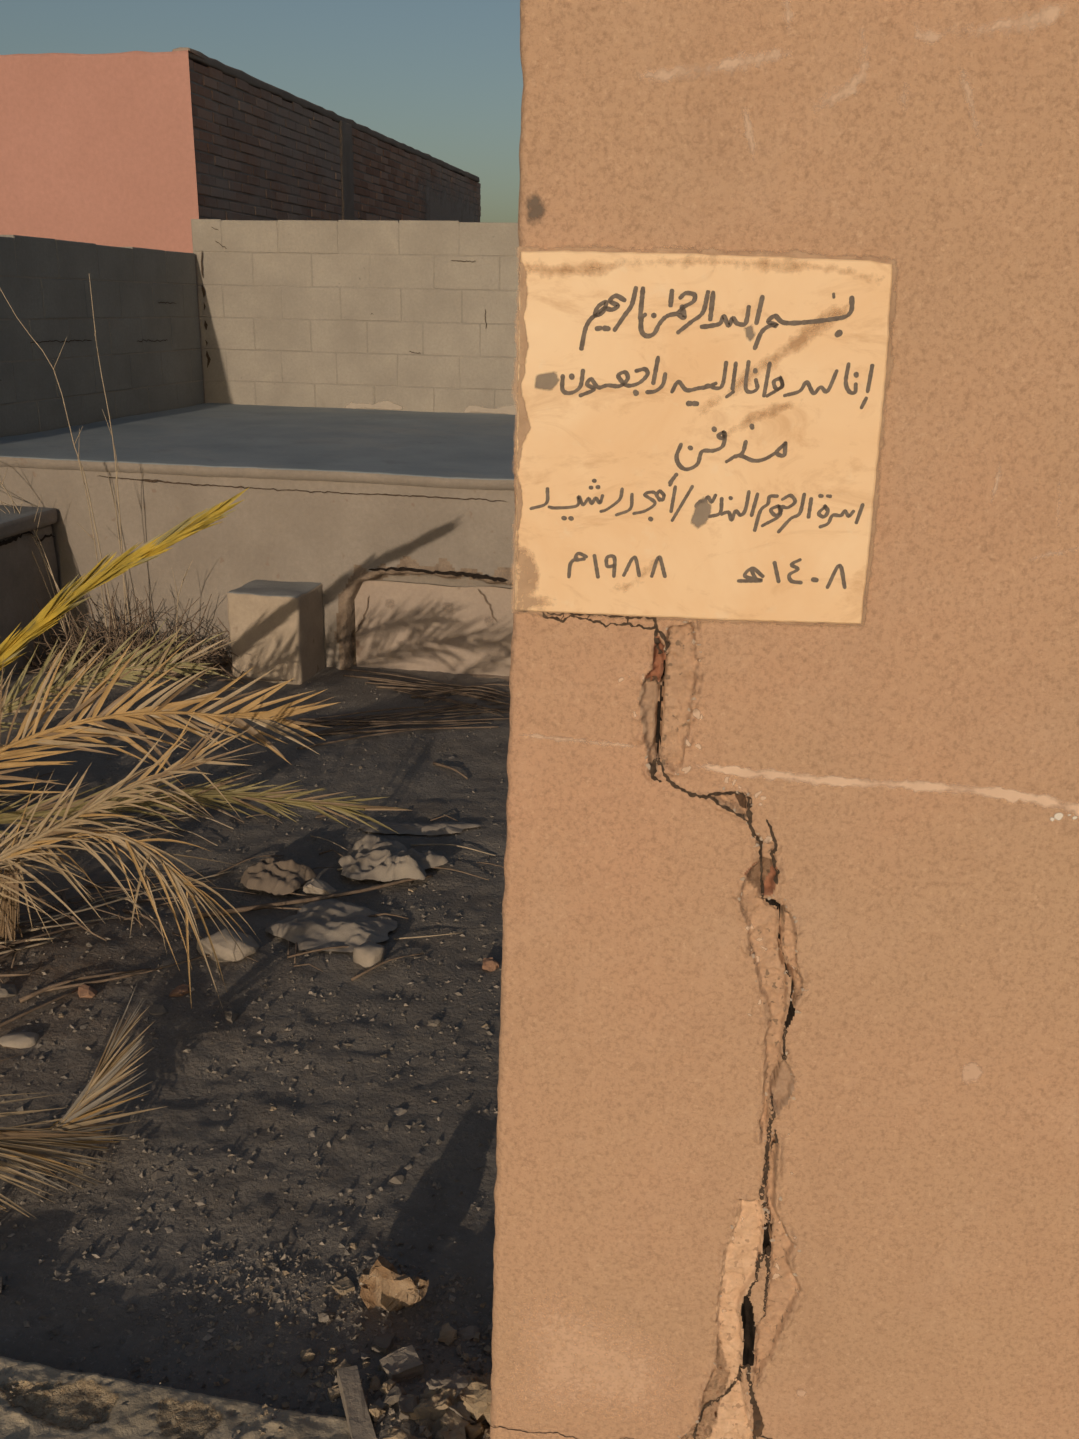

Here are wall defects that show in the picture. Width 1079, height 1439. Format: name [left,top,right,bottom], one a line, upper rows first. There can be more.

crack [0,531,55,546]
crack [355,567,795,1060]
flaking render [619,618,1079,1439]
crack [491,1426,577,1439]
crack [693,1096,778,1439]